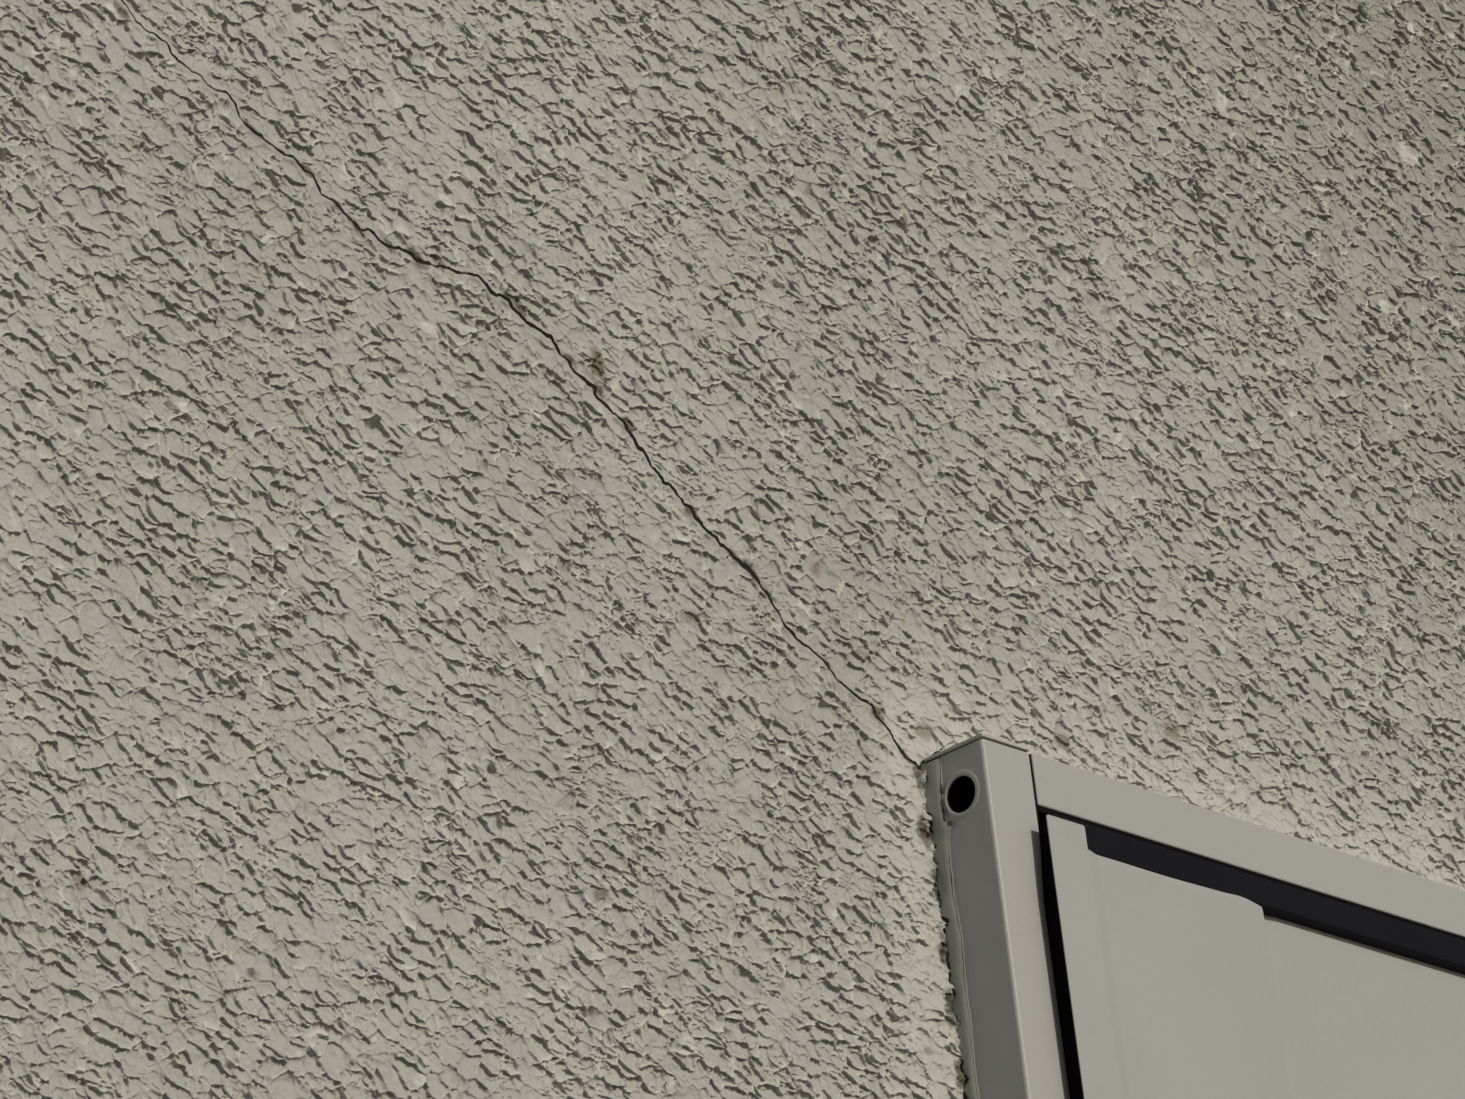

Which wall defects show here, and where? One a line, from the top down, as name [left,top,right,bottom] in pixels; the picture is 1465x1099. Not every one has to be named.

crack [114,0,978,1099]